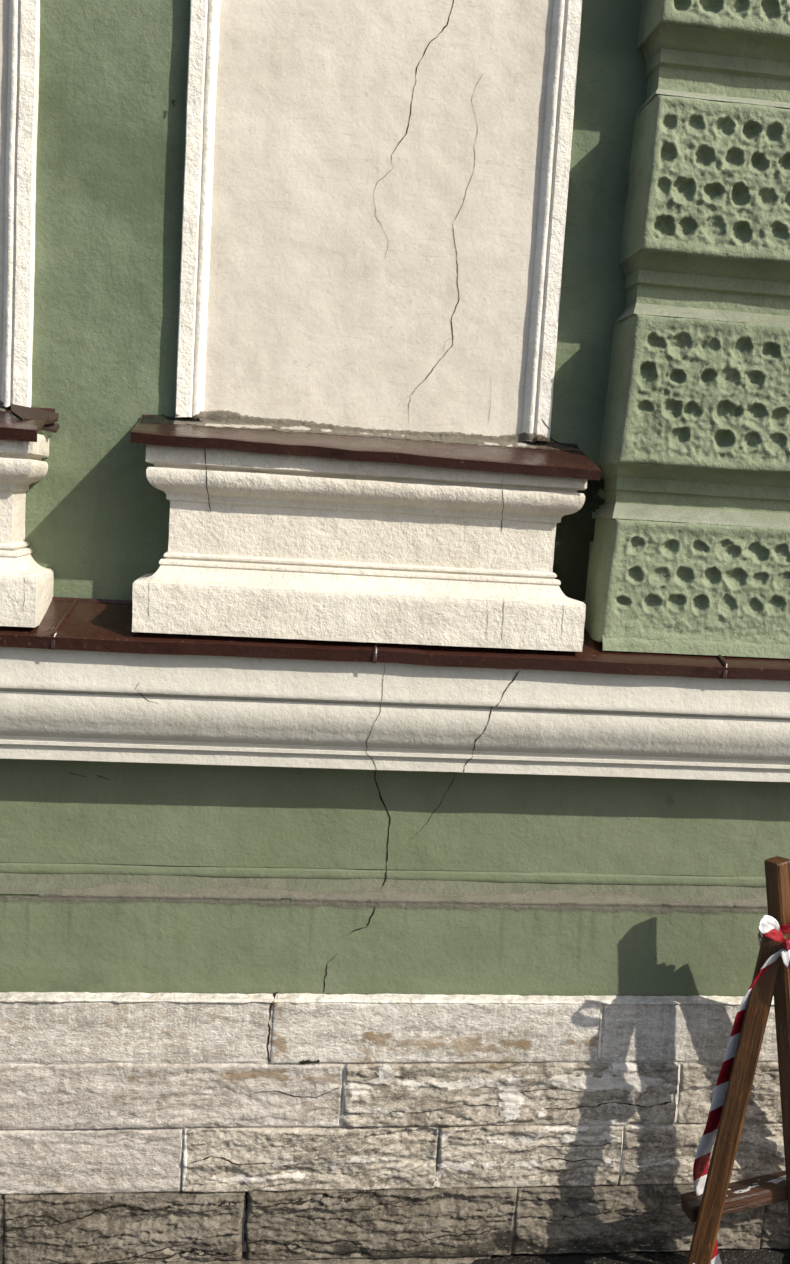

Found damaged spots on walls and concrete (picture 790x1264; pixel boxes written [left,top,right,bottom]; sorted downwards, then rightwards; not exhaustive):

crack [373,0,454,258]
crack [406,74,483,413]
crack [323,669,520,995]
crack [267,992,278,1061]
crack [257,1086,341,1098]